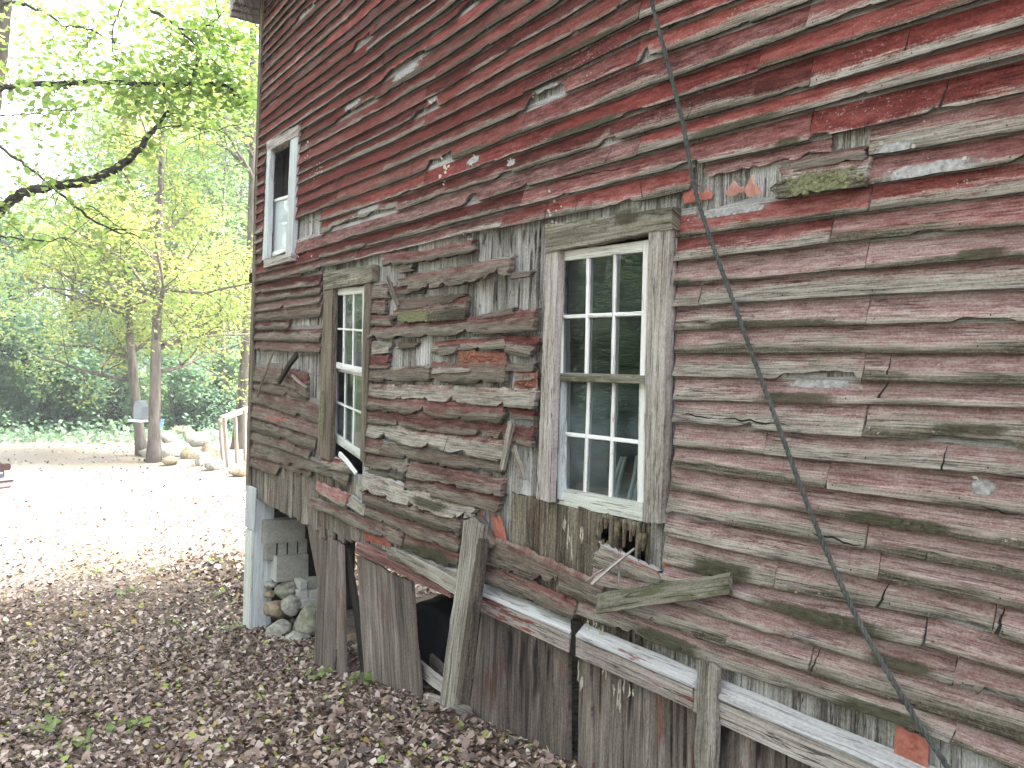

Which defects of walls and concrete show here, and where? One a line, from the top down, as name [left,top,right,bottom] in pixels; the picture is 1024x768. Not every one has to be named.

peeling [392,58,422,82]
peeling [532,81,558,98]
peeling [878,141,916,153]
peeling [890,156,979,199]
peeling [684,174,764,221]
spalling [513,370,538,388]
peeling [790,379,863,390]
crack [877,355,892,398]
crack [681,414,789,426]
peeling [972,476,995,495]
crack [875,584,897,607]
crack [983,607,1005,635]